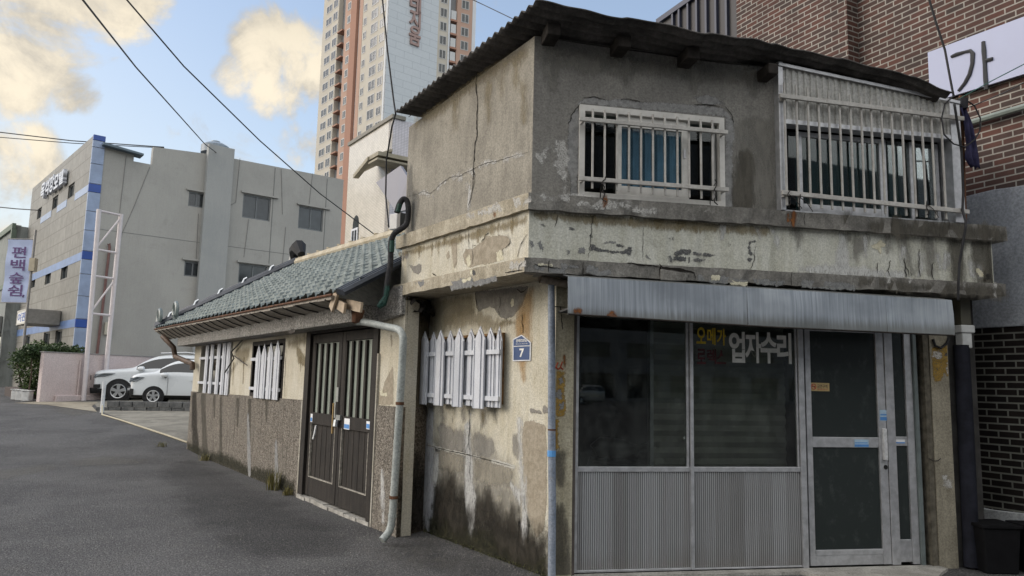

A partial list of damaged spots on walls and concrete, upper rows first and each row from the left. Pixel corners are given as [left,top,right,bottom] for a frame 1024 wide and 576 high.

crack [412,74,527,261]
flaking render [446,233,528,320]
peeling [530,235,632,276]
peeling [668,237,785,287]
damp [400,406,570,576]